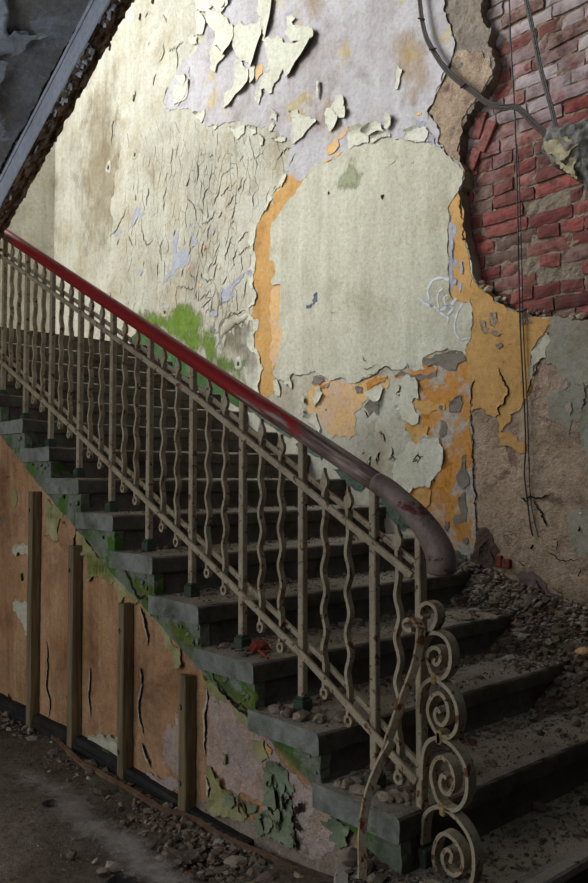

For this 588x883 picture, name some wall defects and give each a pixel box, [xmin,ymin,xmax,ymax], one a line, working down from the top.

spalling [0,0,135,240]
crack [134,41,190,107]
crack [110,143,295,319]
peeling [163,0,588,397]
peeling [300,386,322,432]
peeling [363,384,383,401]
crack [469,380,525,566]
crack [495,358,543,417]
flaking render [471,357,588,602]
crack [521,495,581,604]
crack [205,671,248,717]
flaking render [195,675,356,876]